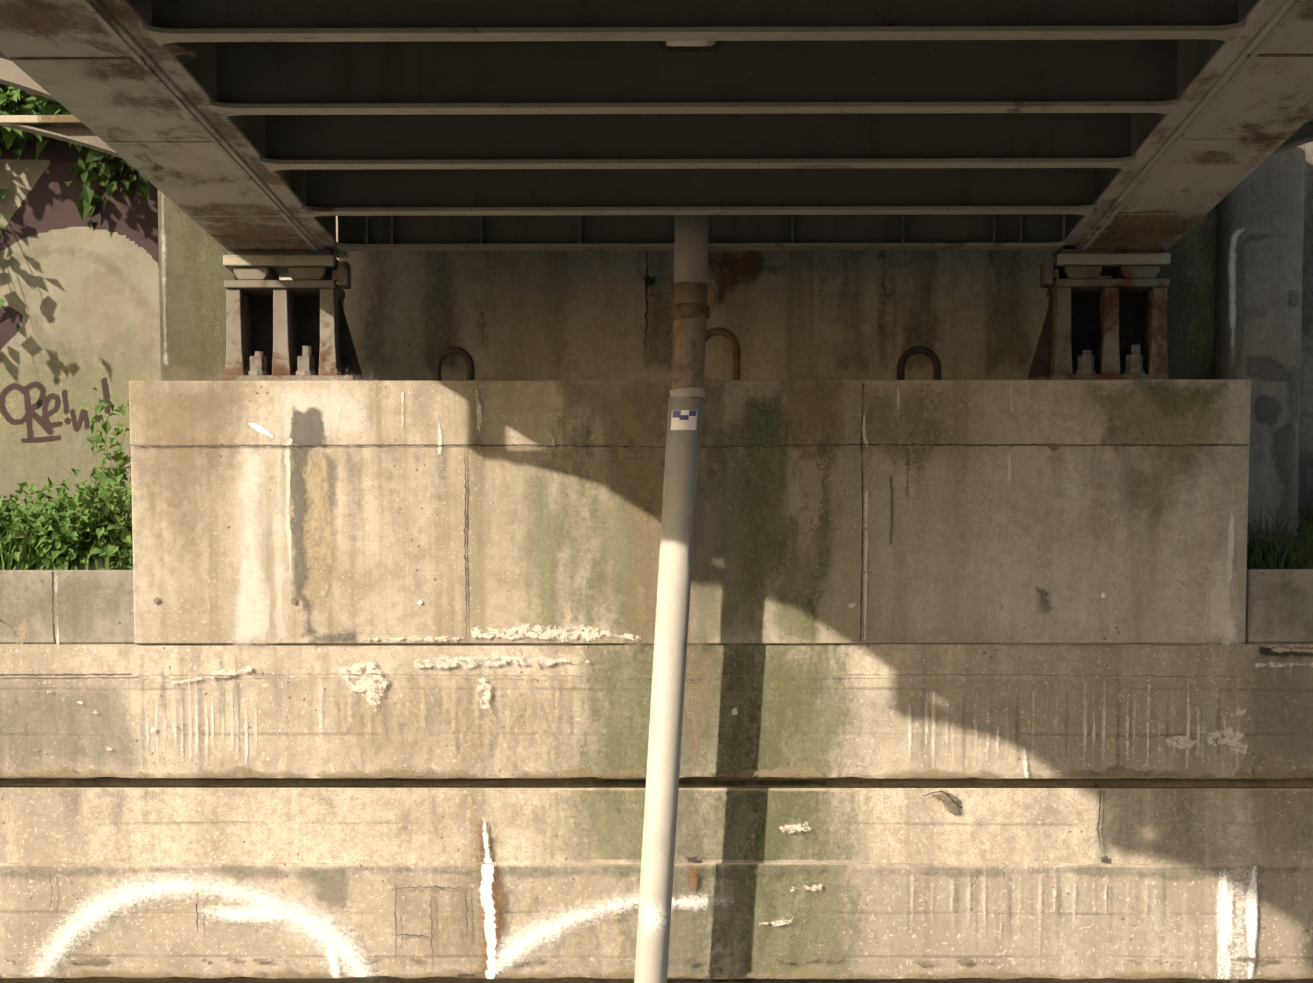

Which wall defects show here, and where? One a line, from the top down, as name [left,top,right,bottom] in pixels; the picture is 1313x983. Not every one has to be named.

corrosion [708,250,775,305]
leakage [1097,383,1221,507]
leakage [701,397,833,640]
crack [0,620,30,644]
leakage [309,477,641,713]